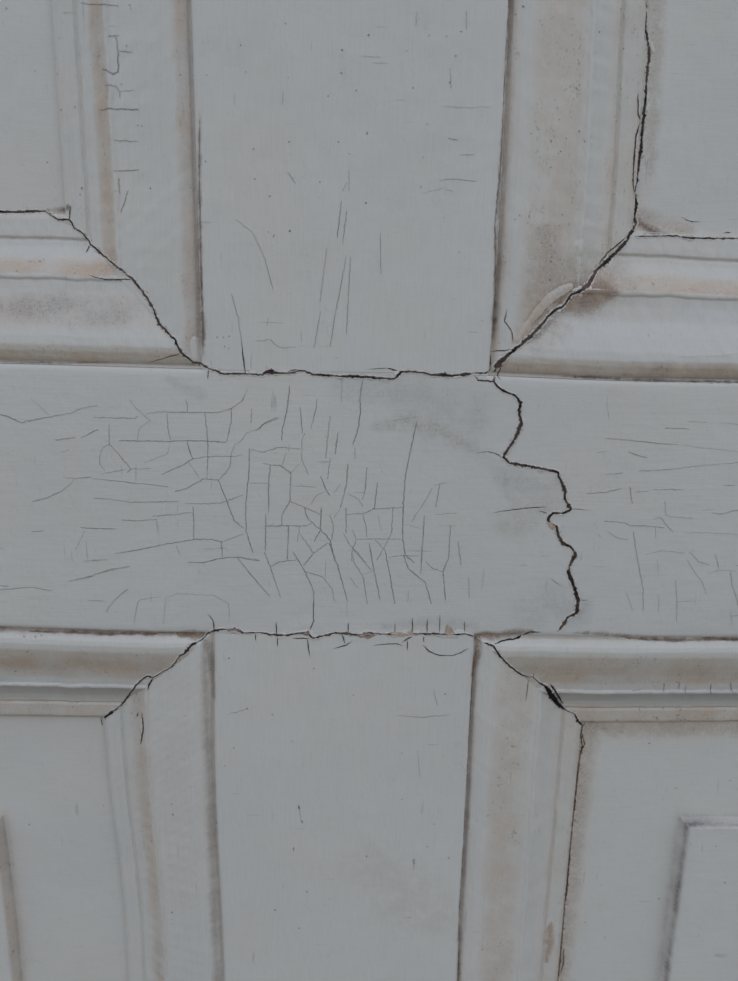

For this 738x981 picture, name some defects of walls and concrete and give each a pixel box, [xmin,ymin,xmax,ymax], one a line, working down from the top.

crack [0,0,738,725]
crack [483,631,594,981]